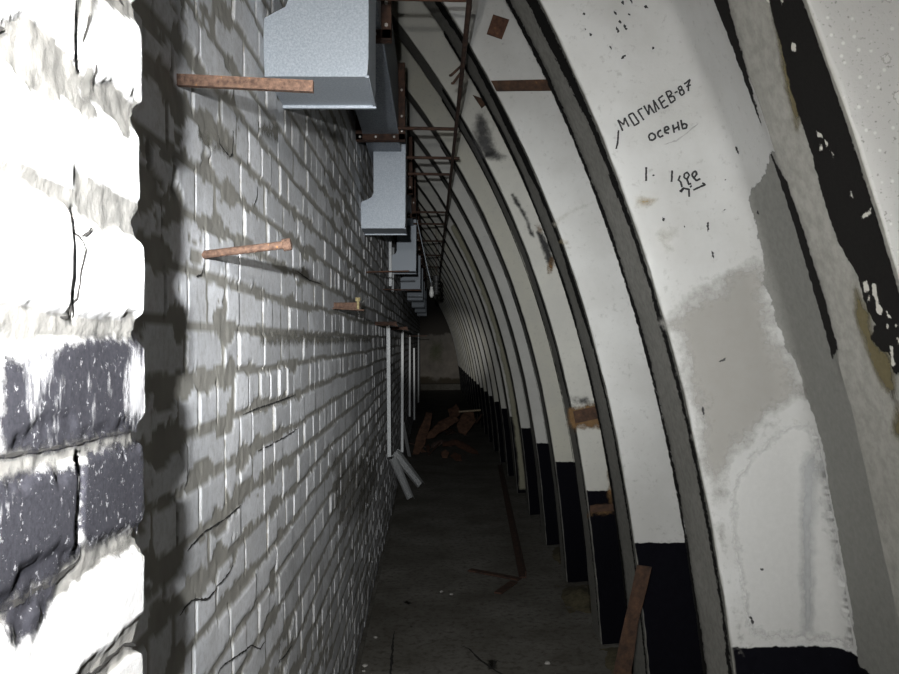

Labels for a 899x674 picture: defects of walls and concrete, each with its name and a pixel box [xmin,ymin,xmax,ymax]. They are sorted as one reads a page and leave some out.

peeling [714,0,761,123]
peeling [766,0,899,374]
crack [60,209,93,319]
peeling [749,151,899,674]
crack [187,505,241,552]
crack [180,566,233,615]